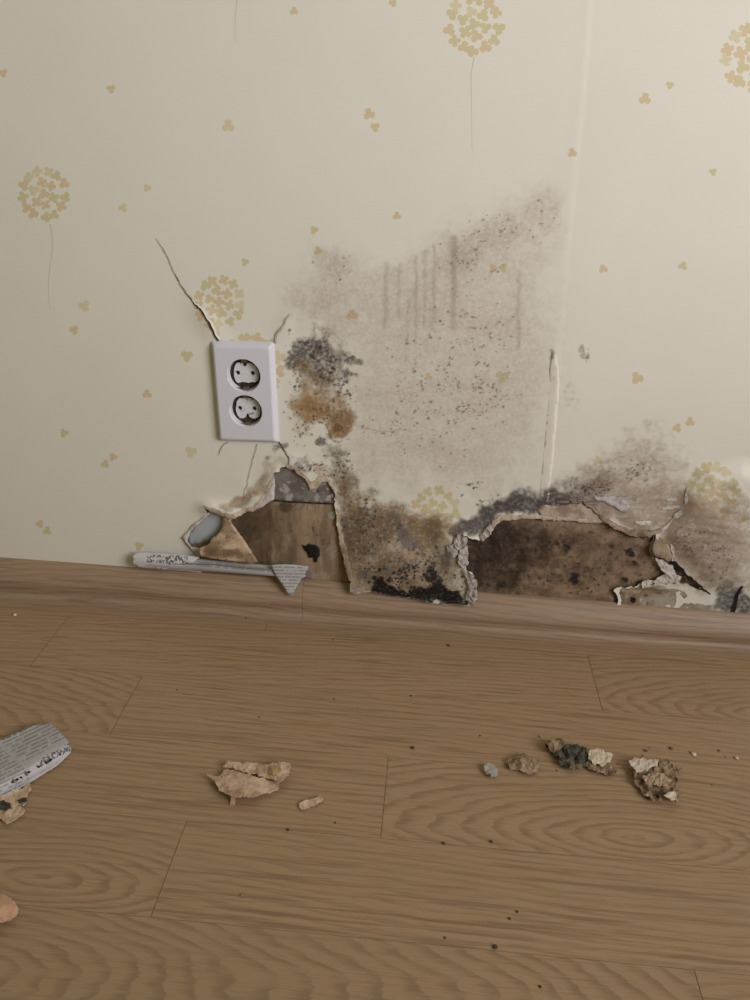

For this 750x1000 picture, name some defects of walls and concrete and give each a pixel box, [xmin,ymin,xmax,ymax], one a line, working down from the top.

crack [158,242,221,341]
leakage [223,476,265,510]
peeling [182,464,353,587]
leakage [277,337,750,613]
peeling [446,501,712,611]